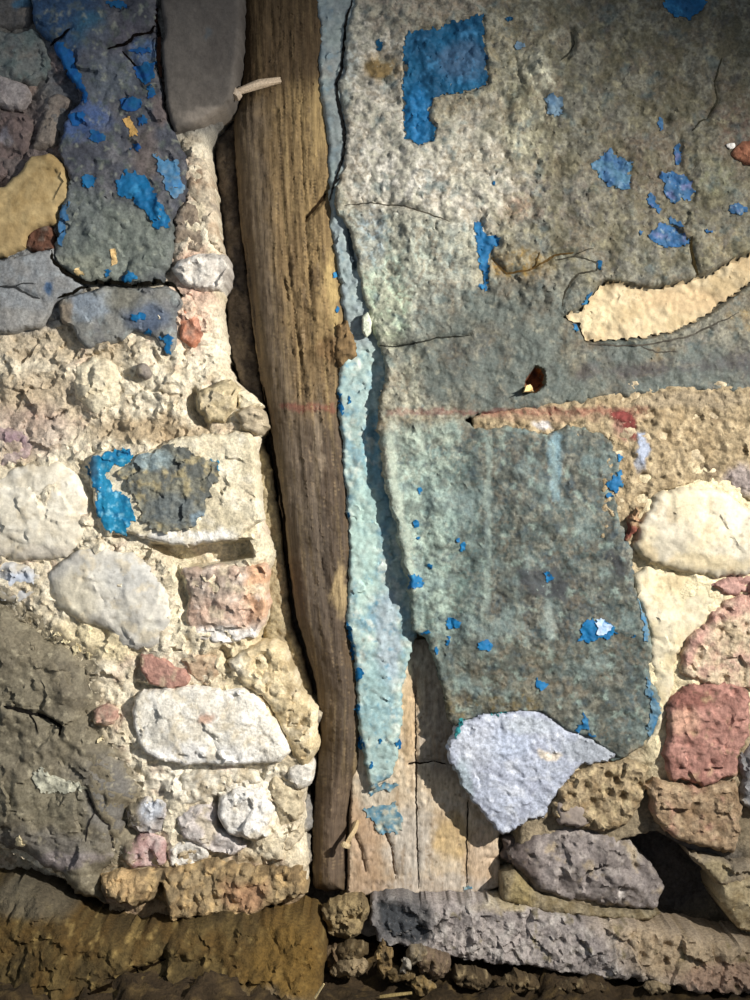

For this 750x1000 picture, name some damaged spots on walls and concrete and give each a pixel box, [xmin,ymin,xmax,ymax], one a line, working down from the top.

peeling [54,42,106,143]
peeling [120,47,157,152]
crack [306,0,450,268]
peeling [402,13,489,146]
peeling [116,154,185,230]
crack [0,250,183,299]
peeling [131,312,175,354]
spalling [522,367,544,393]
flaking render [566,252,750,342]
peeling [85,443,220,537]
flaking render [470,386,750,538]
crack [4,706,62,736]